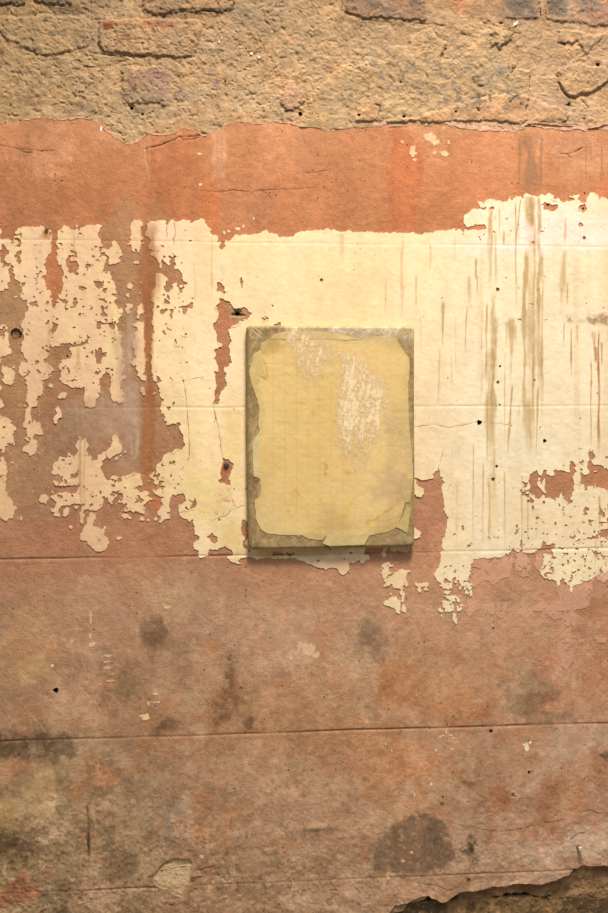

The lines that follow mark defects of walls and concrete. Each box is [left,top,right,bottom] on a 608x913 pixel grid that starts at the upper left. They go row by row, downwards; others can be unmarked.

spalling [0,0,608,145]
crack [146,132,206,149]
damp [515,197,541,230]
damp [509,245,541,337]
peeling [213,282,252,404]
peeling [0,219,197,553]
peeling [218,458,234,485]
peeling [241,519,250,552]
peeling [410,468,448,549]
peeling [520,448,608,554]
spalling [148,849,208,898]
damp [374,814,475,874]